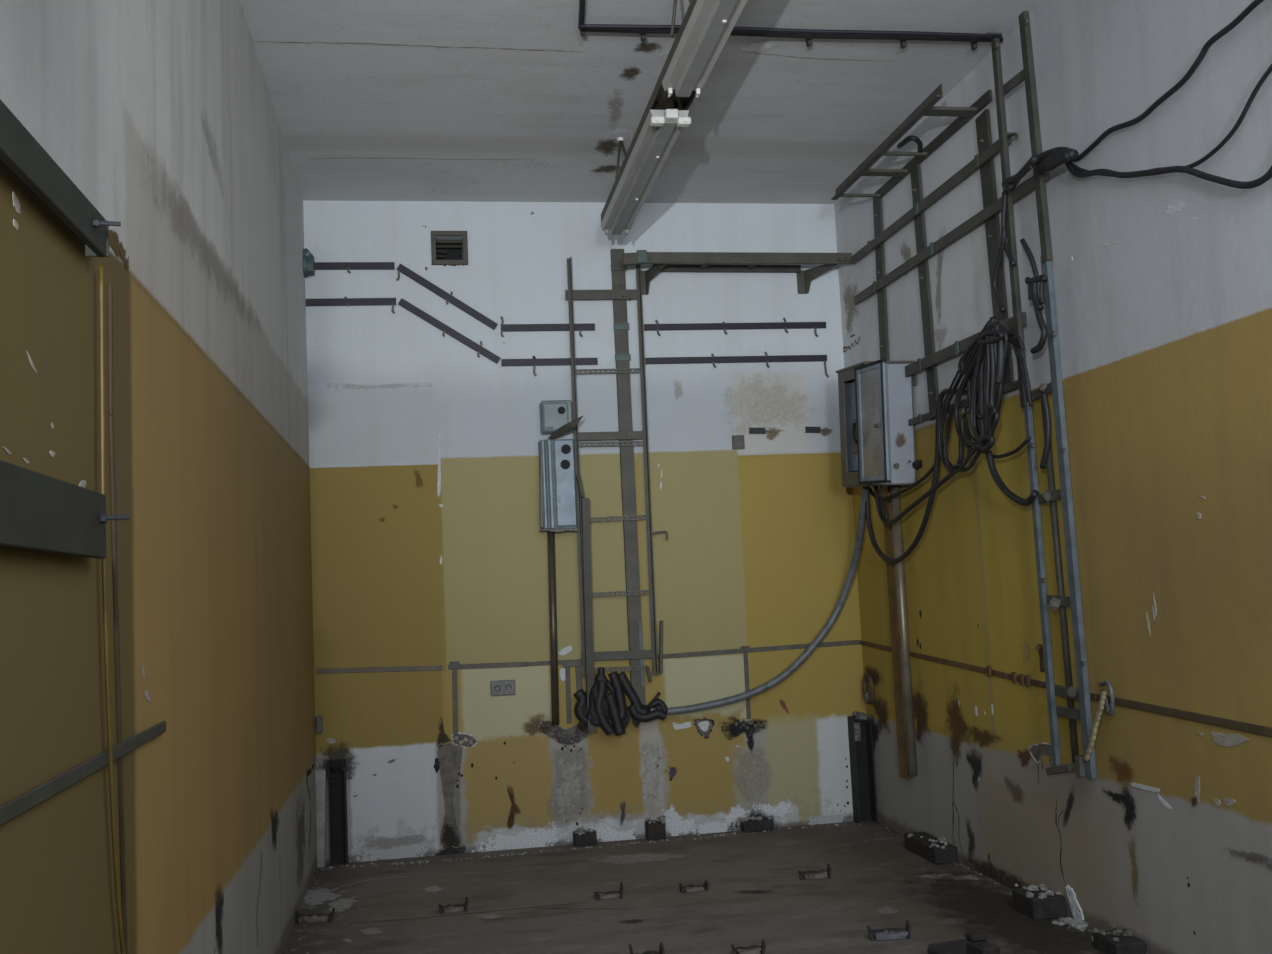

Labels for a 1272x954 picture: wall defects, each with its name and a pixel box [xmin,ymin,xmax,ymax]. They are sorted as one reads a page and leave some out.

rust [863,667,889,732]
rust [913,692,929,742]
rust [947,700,999,764]
rust [507,788,520,828]
water stain [662,799,793,836]
water stain [807,812,853,825]
water stain [1103,791,1124,804]